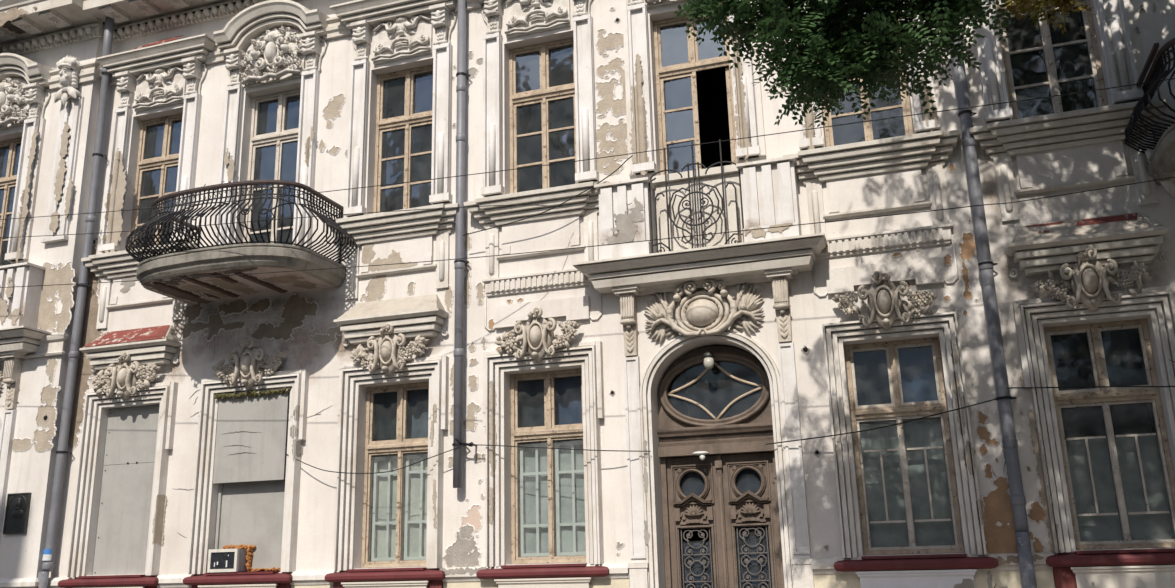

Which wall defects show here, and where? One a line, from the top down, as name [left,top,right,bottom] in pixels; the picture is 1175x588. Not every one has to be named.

peeling [49,121,73,232]
peeling [304,93,348,166]
peeling [595,6,649,176]
peeling [37,261,76,334]
peeling [120,267,344,346]
peeling [360,243,418,302]
peeling [444,232,485,318]
peeling [942,218,979,318]
peeling [12,357,61,453]
flaking render [430,318,505,575]
flaking render [951,342,1061,588]